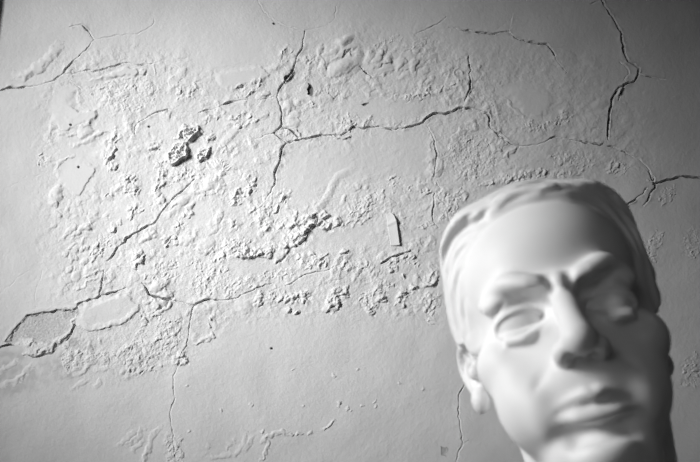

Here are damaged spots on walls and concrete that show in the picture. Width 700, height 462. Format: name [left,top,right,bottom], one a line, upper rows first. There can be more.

crack [0,17,159,104]
peeling [146,123,215,194]
crack [107,0,700,230]
spalling [0,291,189,379]
crack [72,176,335,462]
crack [454,384,471,462]